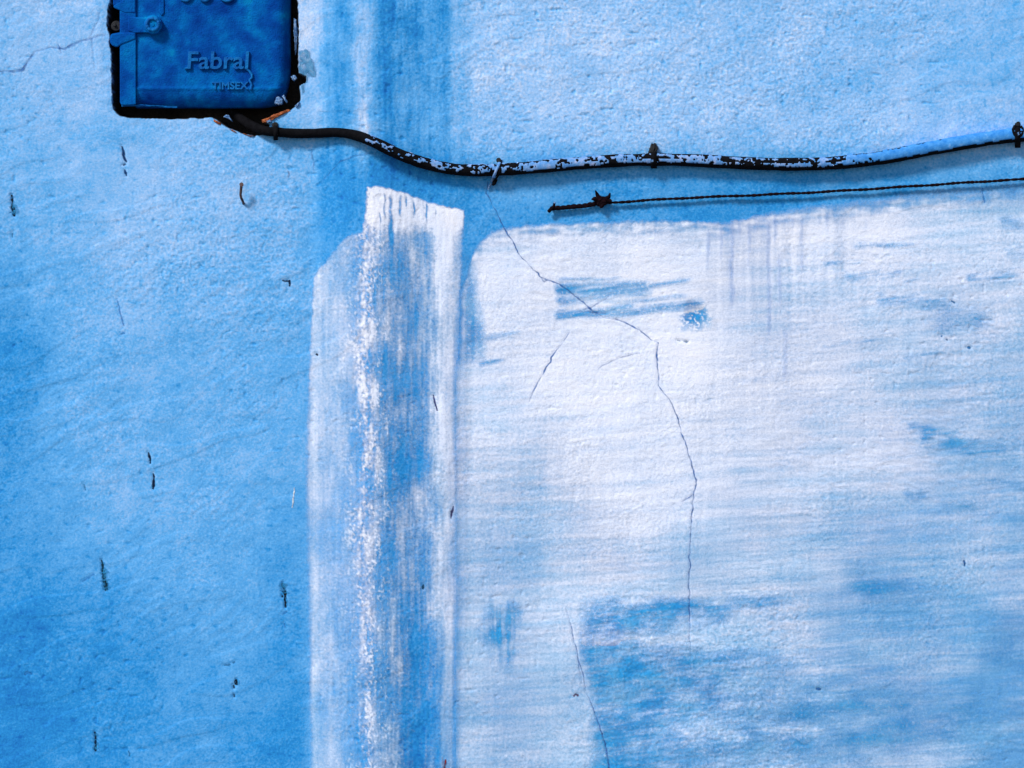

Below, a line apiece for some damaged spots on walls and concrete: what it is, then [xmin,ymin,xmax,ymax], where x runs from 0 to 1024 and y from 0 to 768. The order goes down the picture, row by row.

crack [487,184,697,621]